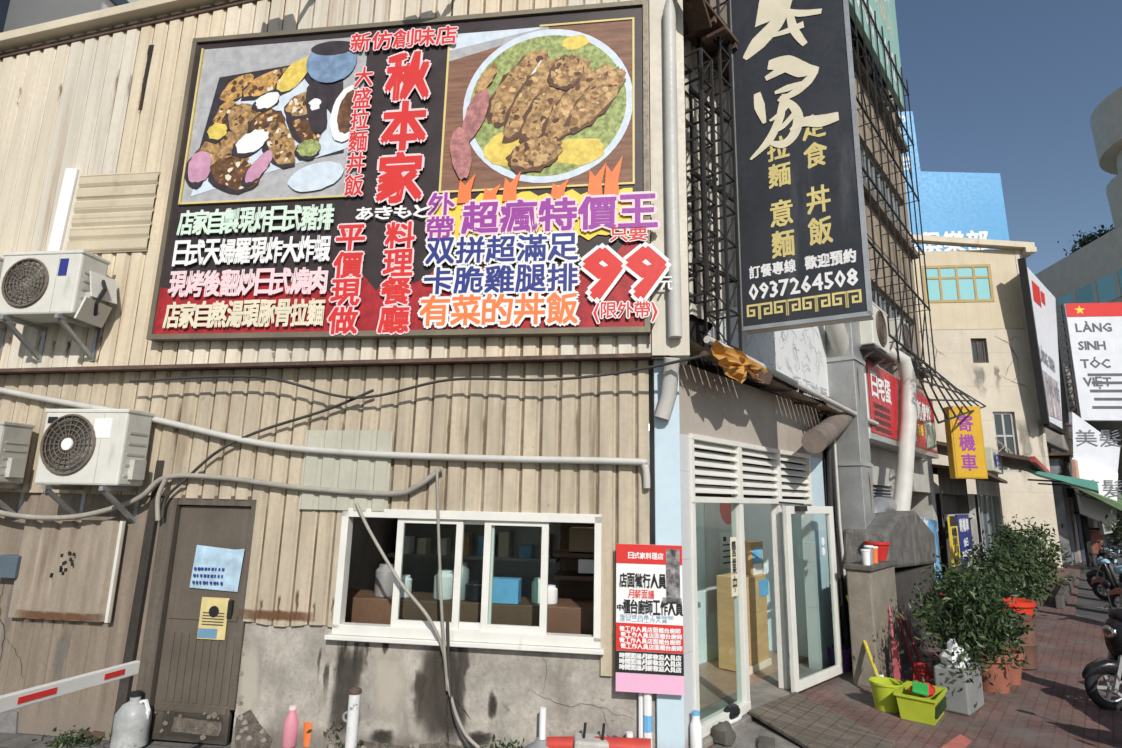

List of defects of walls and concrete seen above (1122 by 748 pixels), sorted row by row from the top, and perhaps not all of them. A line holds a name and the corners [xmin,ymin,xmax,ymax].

crack [997,336,1031,392]
water stain [317,643,469,739]
water stain [489,693,497,717]
water stain [373,730,391,744]
water stain [470,732,491,745]